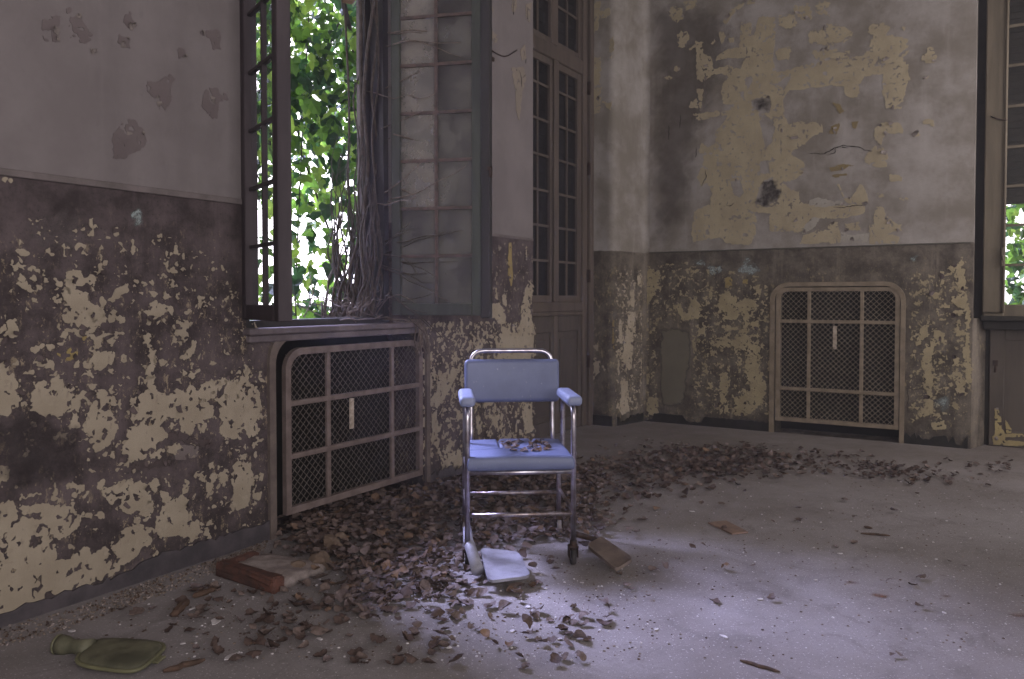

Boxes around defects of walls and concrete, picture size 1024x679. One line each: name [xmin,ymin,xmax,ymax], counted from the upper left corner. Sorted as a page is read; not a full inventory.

leakage [757,180,781,205]
peeling [667,0,910,245]
crack [802,145,870,173]
peeling [0,218,267,614]
peeling [422,243,536,470]
peeling [593,262,770,416]
peeling [908,257,974,430]
peeling [992,408,1024,446]